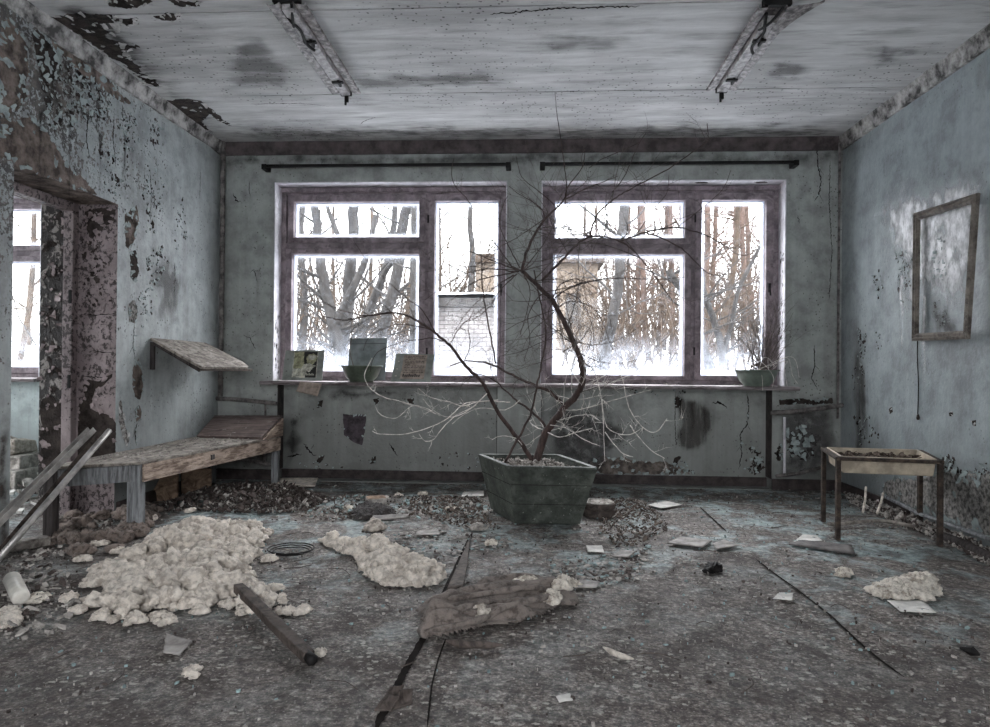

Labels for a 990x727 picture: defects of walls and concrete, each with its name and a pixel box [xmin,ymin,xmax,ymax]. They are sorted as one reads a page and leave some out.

peeling [52,0,201,87]
crack [491,6,637,15]
spalling [0,17,164,196]
peeling [167,99,231,133]
peeling [79,164,188,327]
peeling [36,211,64,470]
peeling [77,359,144,458]
peeling [343,414,366,445]
water stain [678,399,710,448]
peeling [744,424,815,475]
spalling [882,454,990,537]
crack [756,559,904,677]